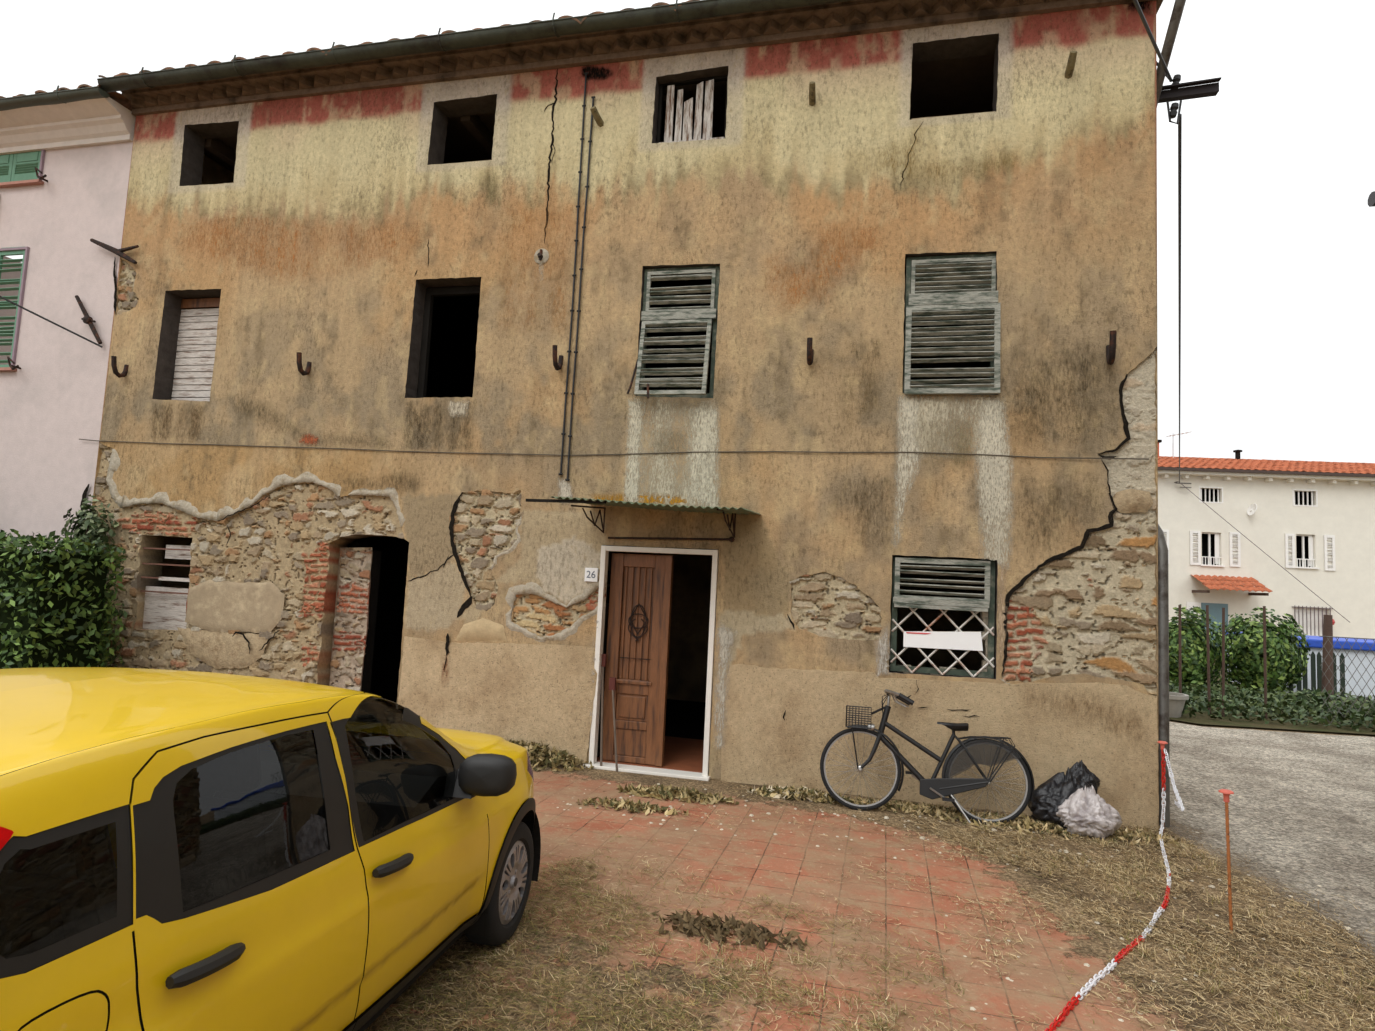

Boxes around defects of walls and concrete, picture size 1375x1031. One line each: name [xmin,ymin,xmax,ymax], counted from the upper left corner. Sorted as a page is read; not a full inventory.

crack [900,122,923,189]
flaking render [95,443,405,686]
flaking render [449,488,606,642]
water stain [624,399,719,508]
flaking render [789,572,882,640]
water stain [852,396,1013,657]
flaking render [980,348,1158,696]